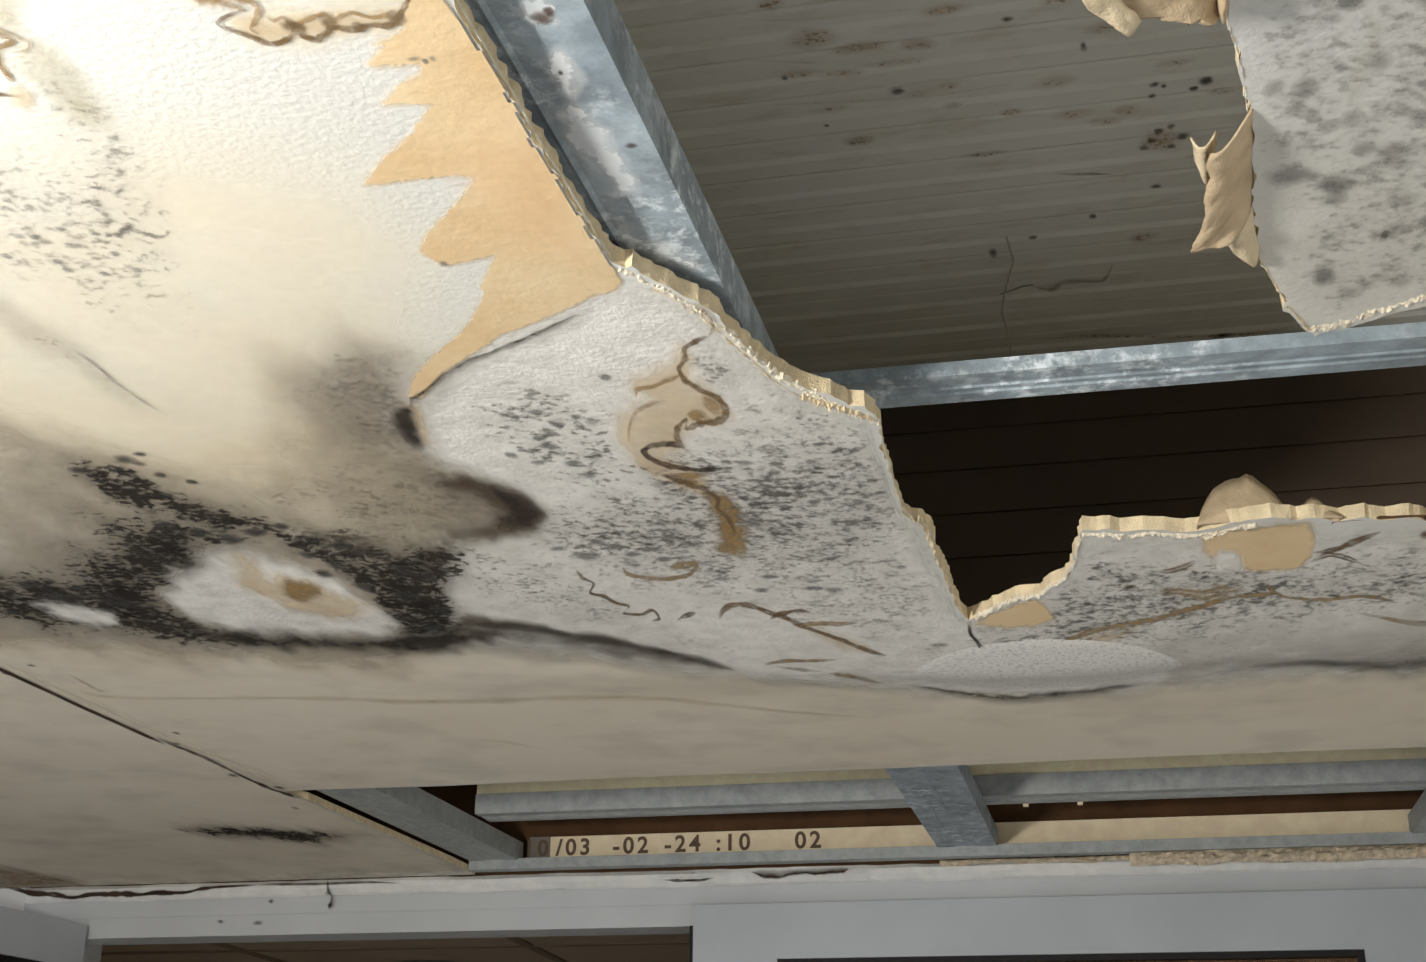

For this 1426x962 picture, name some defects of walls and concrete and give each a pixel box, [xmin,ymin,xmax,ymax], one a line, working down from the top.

water stain [0,29,30,100]
water stain [197,0,410,46]
corrosion [523,0,555,25]
flaking render [1227,0,1248,112]
flaking render [457,0,613,261]
corrosion [550,51,635,191]
corrosion [622,234,694,268]
flaking render [1258,255,1426,333]
water stain [0,260,721,669]
water stain [494,308,883,655]
peeling [0,267,1426,888]
water stain [770,659,874,682]